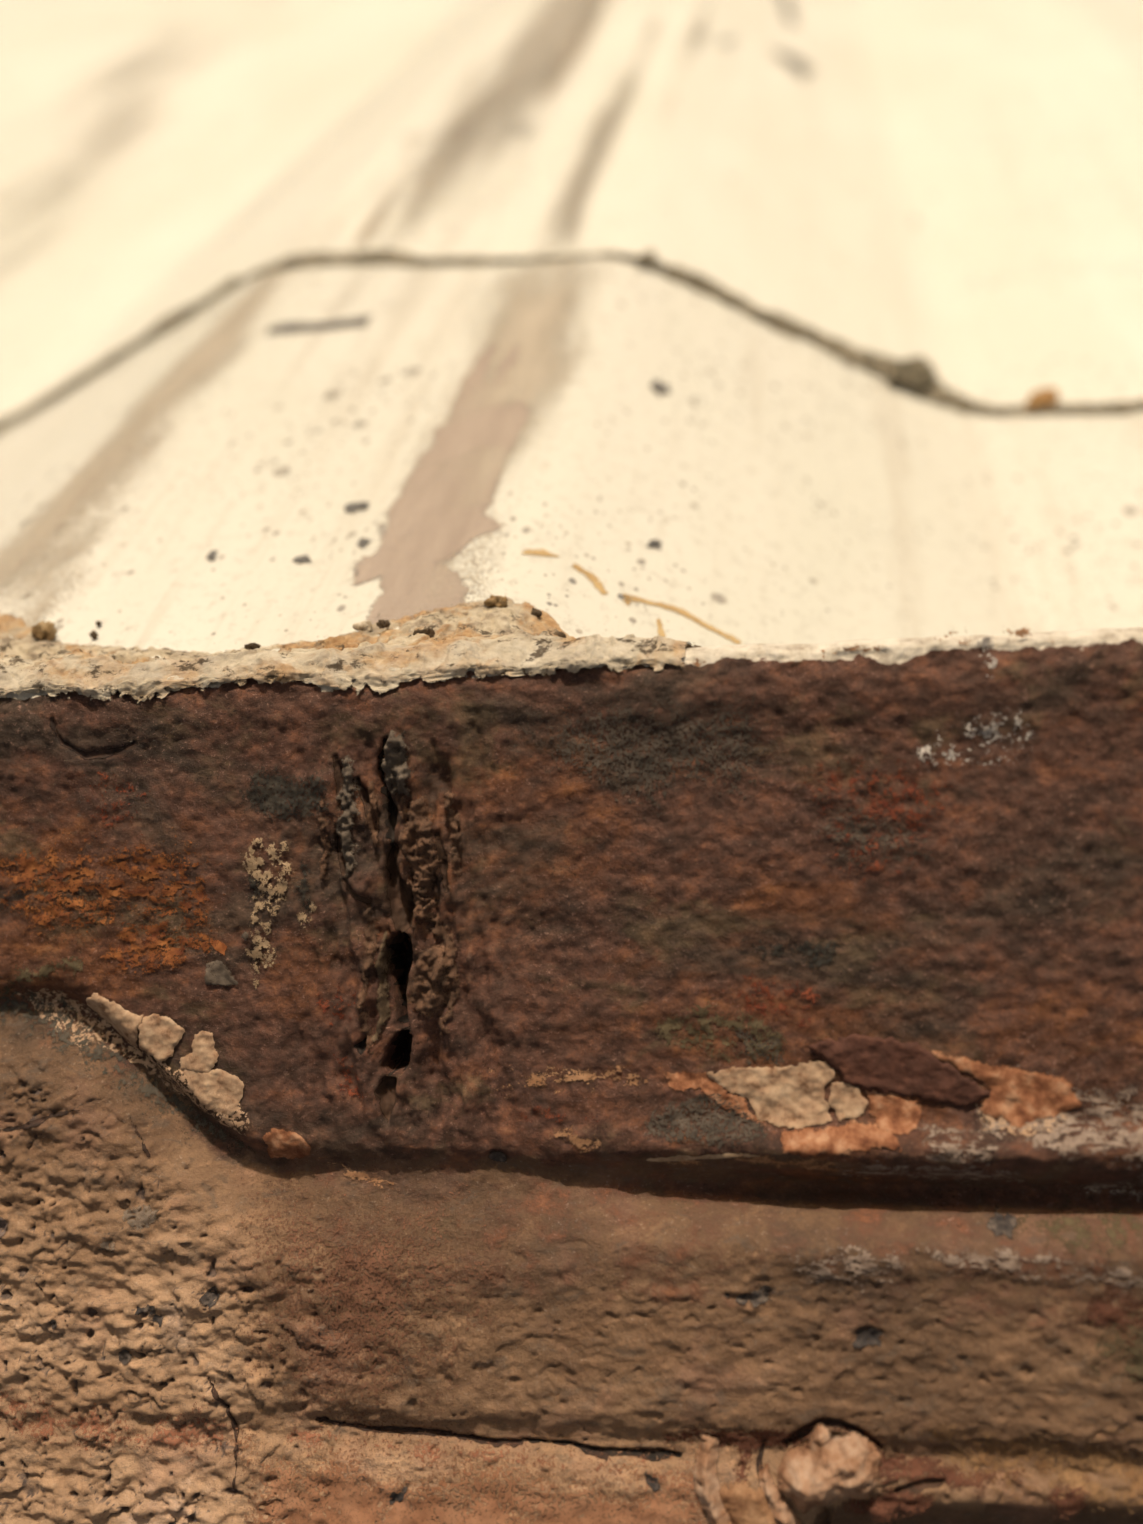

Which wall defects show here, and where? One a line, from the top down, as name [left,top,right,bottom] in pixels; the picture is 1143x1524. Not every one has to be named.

leakage [0,0,666,635]
corrosion [821,644,883,658]
corrosion [1003,625,1032,641]
corrosion [0,766,227,980]
crack [317,730,462,1122]
peeling [15,988,311,1160]
corrosion [489,1064,648,1153]
peeling [661,1050,1143,1203]
peeling [782,1205,1143,1293]
crack [315,1417,682,1461]